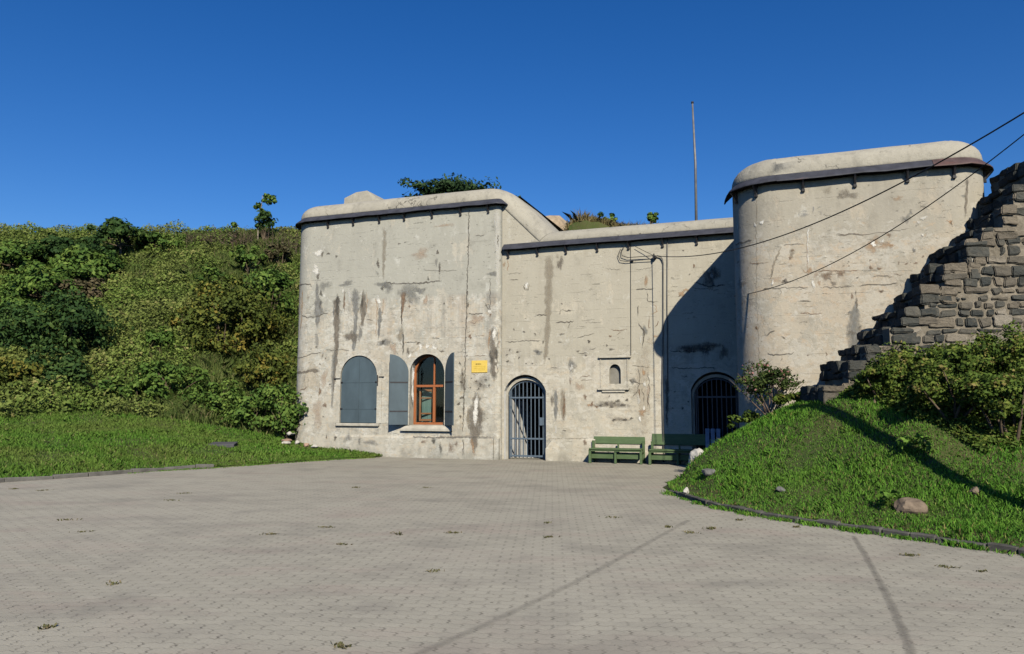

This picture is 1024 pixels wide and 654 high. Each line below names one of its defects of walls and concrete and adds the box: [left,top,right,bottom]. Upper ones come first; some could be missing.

leakage [315,281,362,397]
leakage [376,232,389,345]
corrosion [391,294,410,352]
leakage [535,258,562,358]
leakage [672,343,727,356]
leakage [413,395,493,453]